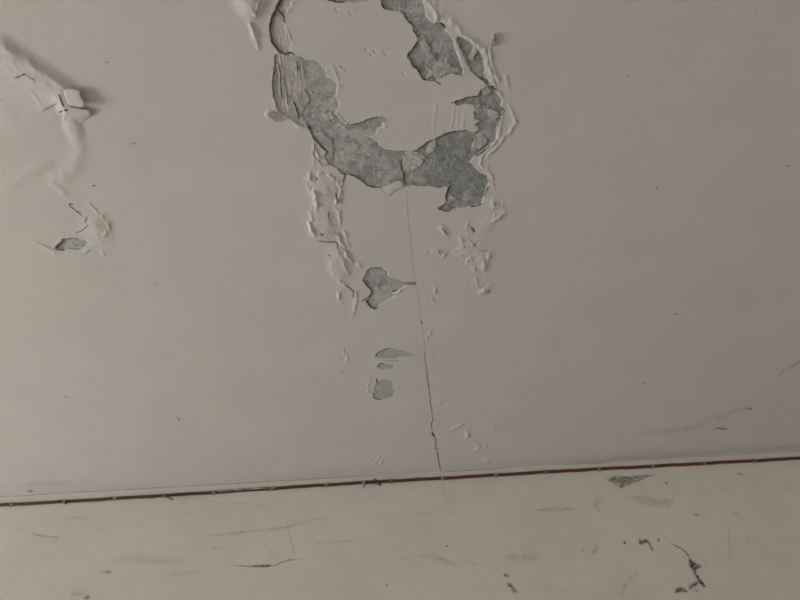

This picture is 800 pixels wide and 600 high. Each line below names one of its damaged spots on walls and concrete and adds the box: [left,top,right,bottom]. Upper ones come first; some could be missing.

peeling [262,0,521,217]
peeling [31,201,120,259]
peeling [356,262,424,313]
peeling [364,344,421,402]
crack [424,352,505,512]